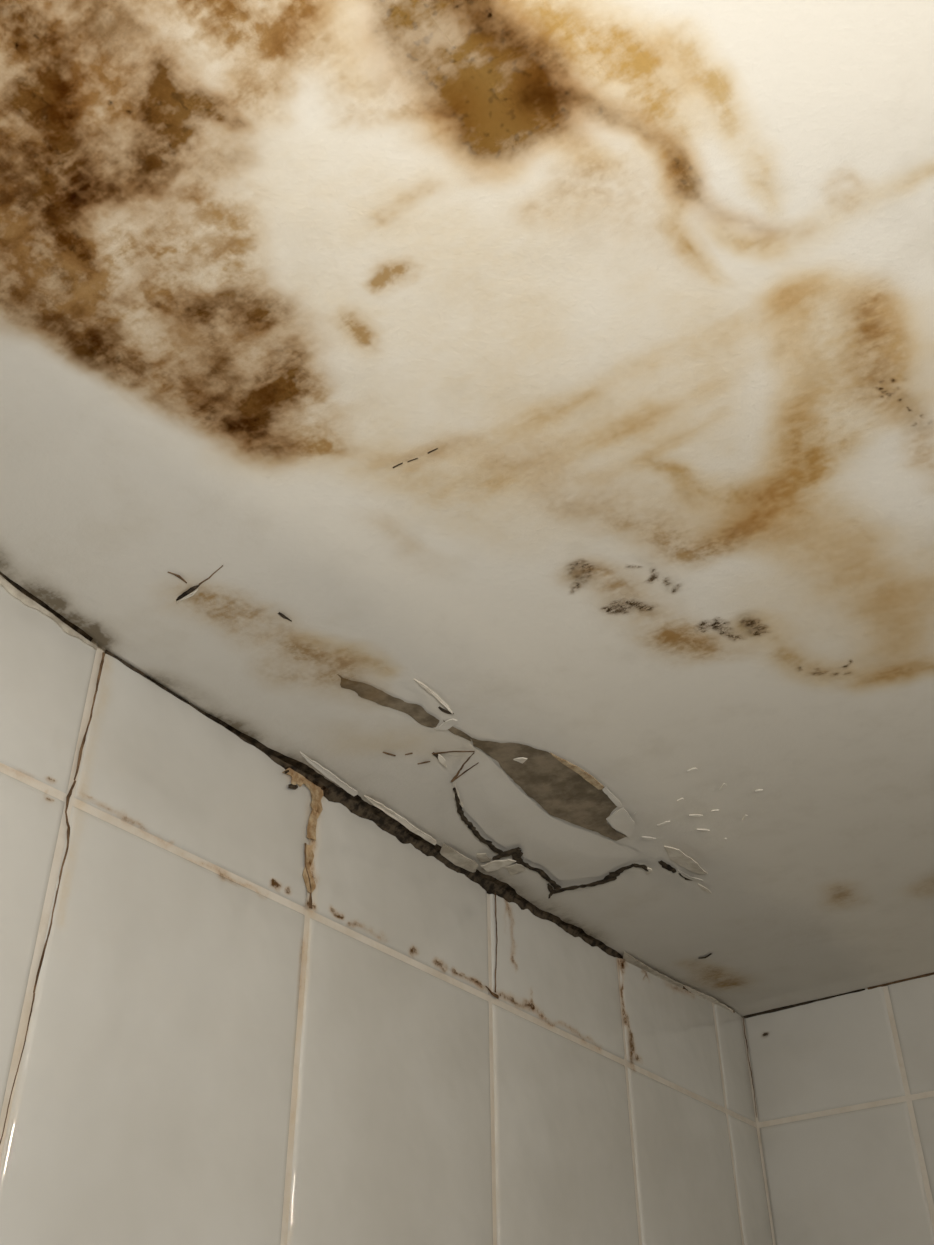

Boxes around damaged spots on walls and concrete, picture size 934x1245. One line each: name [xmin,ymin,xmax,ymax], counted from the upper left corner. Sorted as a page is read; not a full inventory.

damp [13,14,55,53]
damp [10,63,114,260]
damp [128,63,223,173]
damp [384,0,562,155]
damp [73,335,114,359]
damp [247,308,270,324]
damp [226,368,301,431]
crack [168,565,223,603]
peeling [337,674,712,894]
crack [0,572,934,1144]